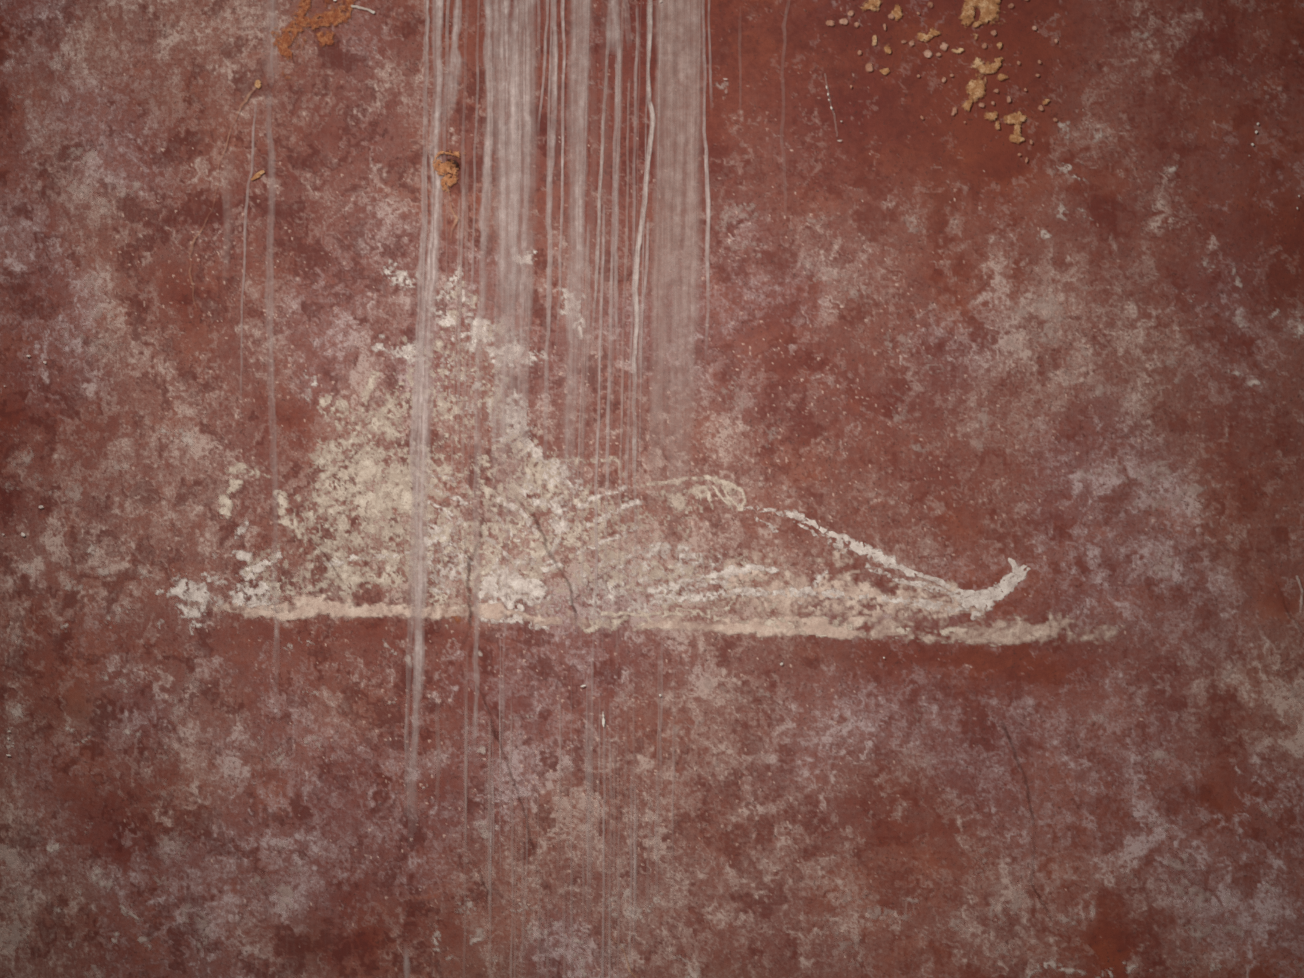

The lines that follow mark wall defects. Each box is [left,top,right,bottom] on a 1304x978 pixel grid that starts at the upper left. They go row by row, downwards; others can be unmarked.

corrosion [271,0,355,74]
damp [384,0,460,706]
damp [480,0,618,390]
damp [621,0,750,416]
peeling [826,0,1057,162]